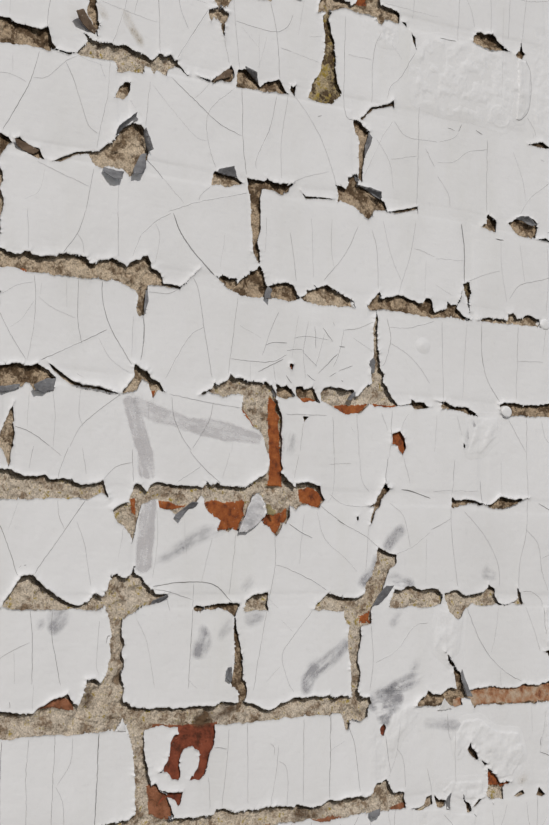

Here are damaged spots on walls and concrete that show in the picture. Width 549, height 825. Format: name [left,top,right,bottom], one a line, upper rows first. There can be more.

peeling [0,0,189,99]
crack [0,276,145,366]
peeling [0,363,163,397]
peeling [0,248,184,316]
crack [118,160,429,482]
peeling [211,166,351,307]
peeling [113,282,475,540]
crack [400,224,549,308]
crack [153,536,236,687]
crack [253,414,377,690]
peeling [0,547,500,825]
crack [92,737,100,825]